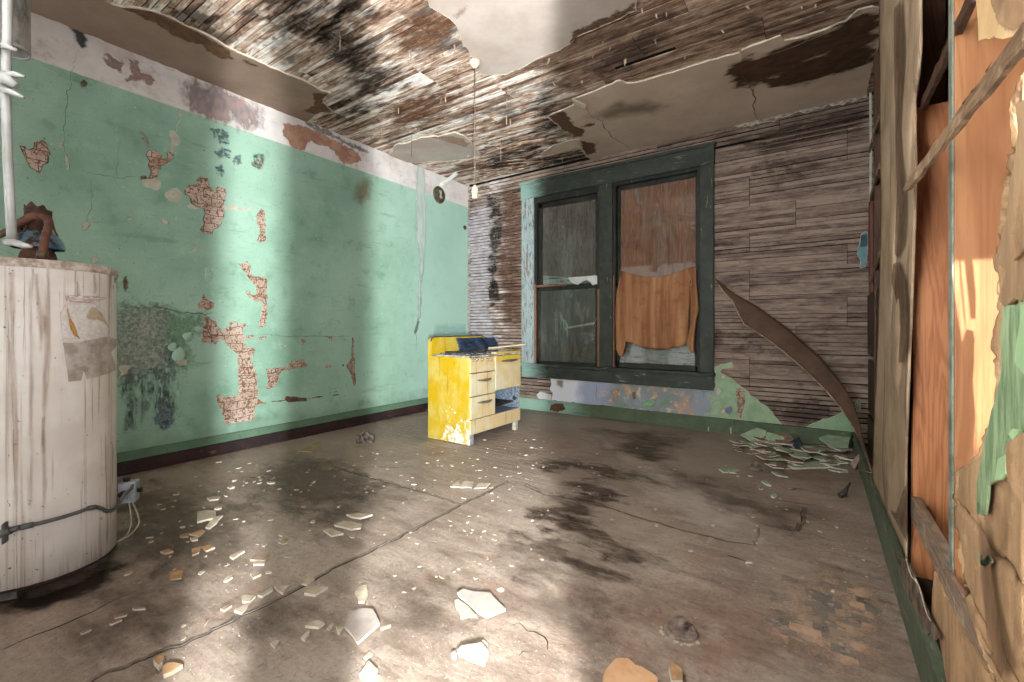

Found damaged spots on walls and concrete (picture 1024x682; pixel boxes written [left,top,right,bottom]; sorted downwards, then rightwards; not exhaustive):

peeling [104,0,361,165]
spalling [547,7,879,158]
damp [725,13,879,88]
peeling [19,140,70,173]
peeling [139,130,266,243]
damp [117,302,202,430]
peeling [198,261,339,425]
peeling [977,299,1024,515]
damp [118,494,242,557]
damp [264,460,377,525]
crack [86,463,825,682]
damp [516,461,653,580]